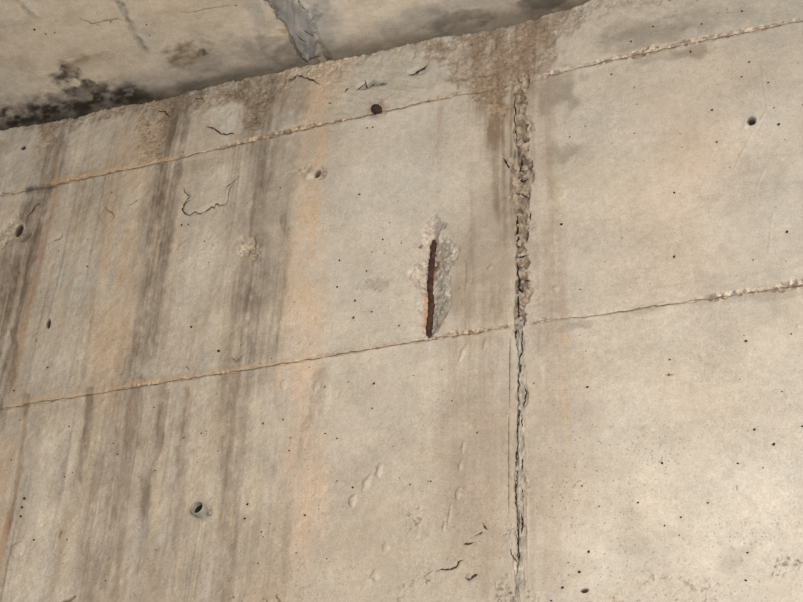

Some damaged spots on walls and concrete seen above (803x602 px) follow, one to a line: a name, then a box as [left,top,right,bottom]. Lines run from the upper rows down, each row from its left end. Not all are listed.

rust [364,97,392,123]
crack [182,175,240,216]
damp [0,37,583,602]
rust [418,292,429,335]
spalling [404,212,462,341]
crack [508,334,520,594]